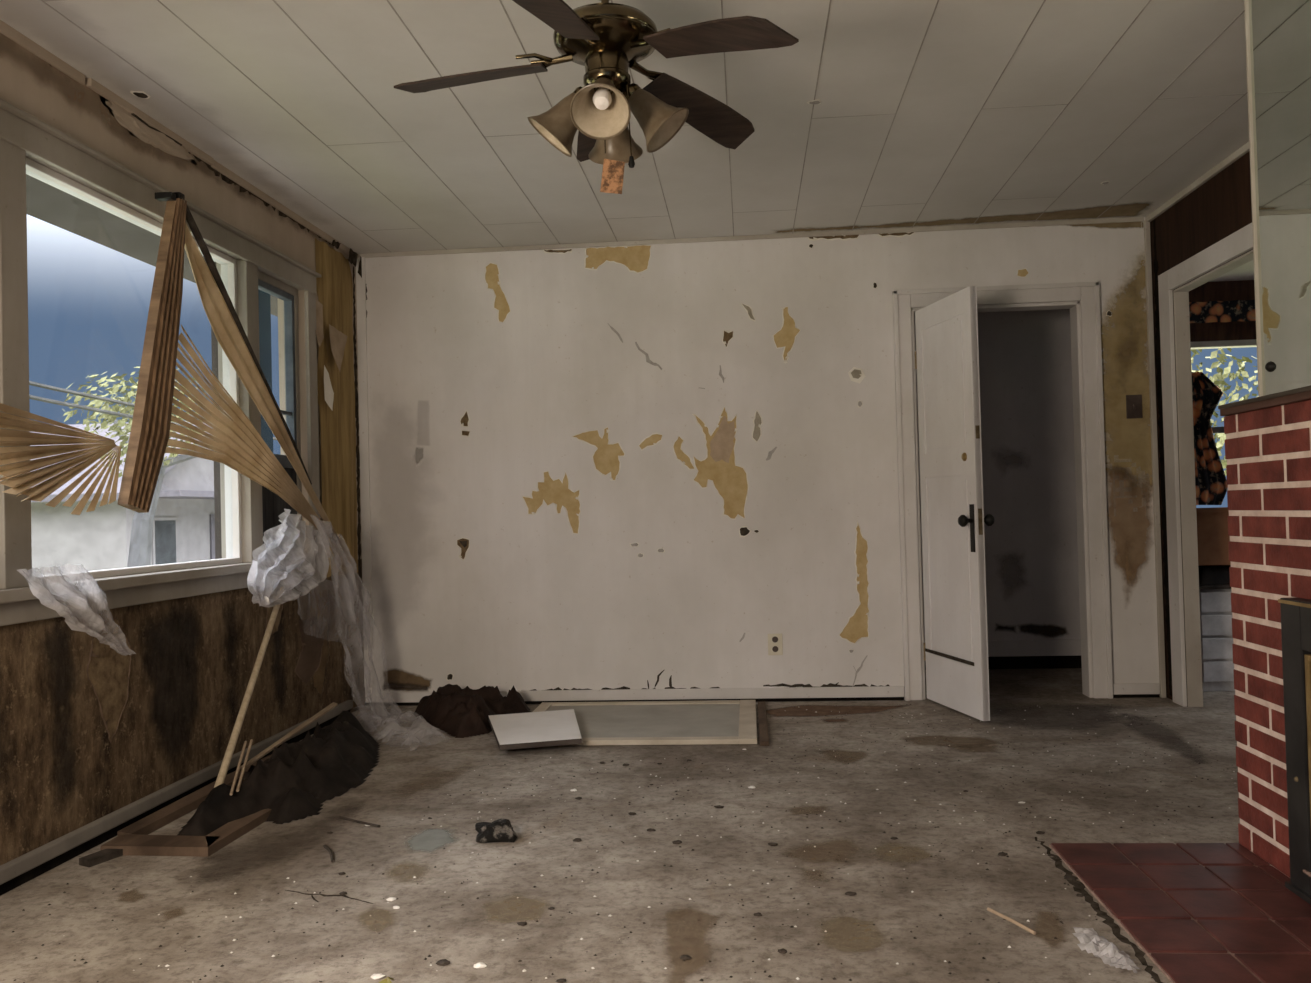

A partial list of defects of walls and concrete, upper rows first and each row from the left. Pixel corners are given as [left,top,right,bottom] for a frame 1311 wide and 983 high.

peeling [484,262,511,323]
peeling [773,306,801,364]
peeling [521,470,581,534]
peeling [572,406,763,537]
peeling [839,521,870,653]